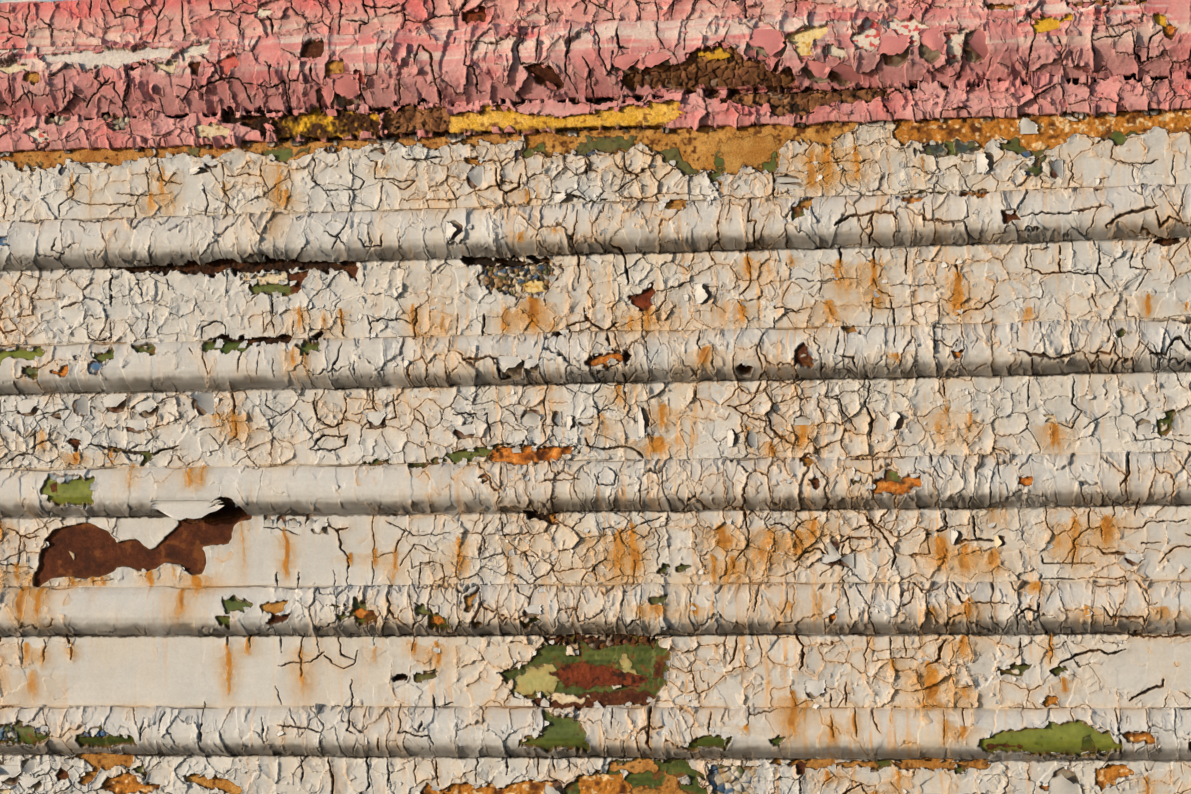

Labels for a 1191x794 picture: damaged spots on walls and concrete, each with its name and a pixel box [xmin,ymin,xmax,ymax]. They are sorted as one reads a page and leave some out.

crack [90,0,762,109]
peeling [461,255,564,304]
crack [696,159,969,461]
crack [1025,144,1188,317]
corrosion [14,497,252,621]
corrosion [609,521,641,580]
corrosion [710,525,738,583]
corrosion [934,535,973,572]
crack [262,636,454,794]
peeling [497,586,671,752]
peeling [544,727,761,794]
peeling [978,720,1123,794]